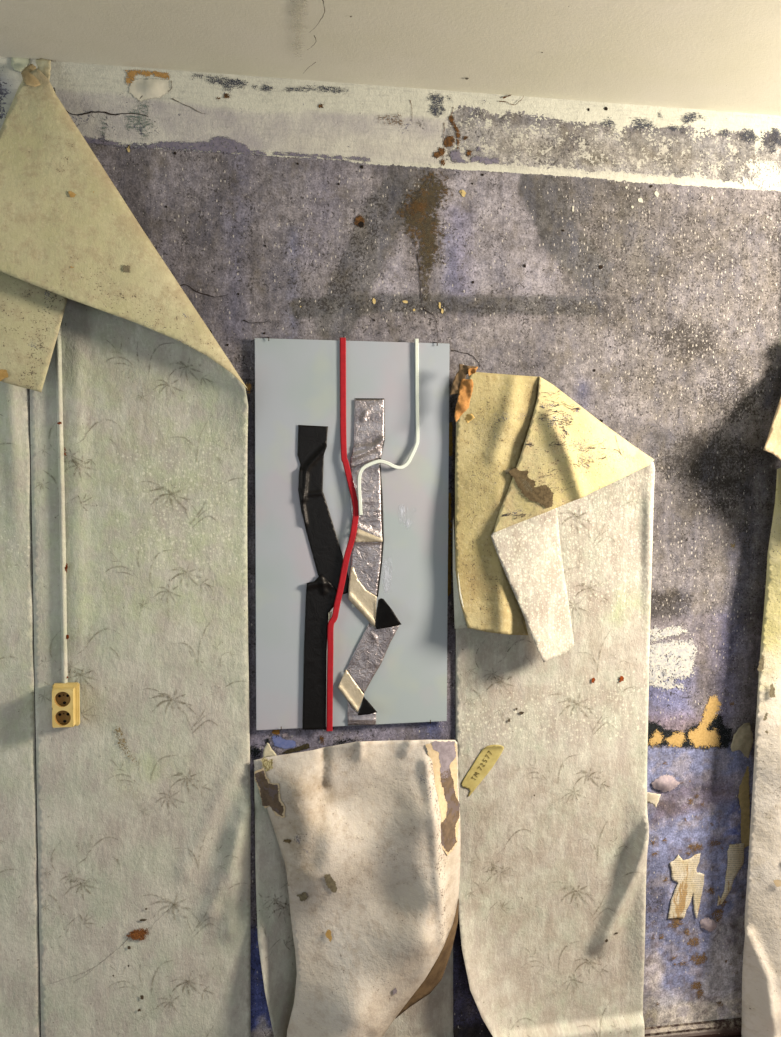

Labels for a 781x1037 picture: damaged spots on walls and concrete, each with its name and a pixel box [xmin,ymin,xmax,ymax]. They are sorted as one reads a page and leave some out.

flaking render [125,69,170,84]
peeling [83,136,371,163]
flaking render [427,91,500,166]
peeling [630,110,708,133]
peeling [719,127,781,153]
peeling [648,695,734,752]
peeling [250,730,361,760]
peeling [738,766,750,848]